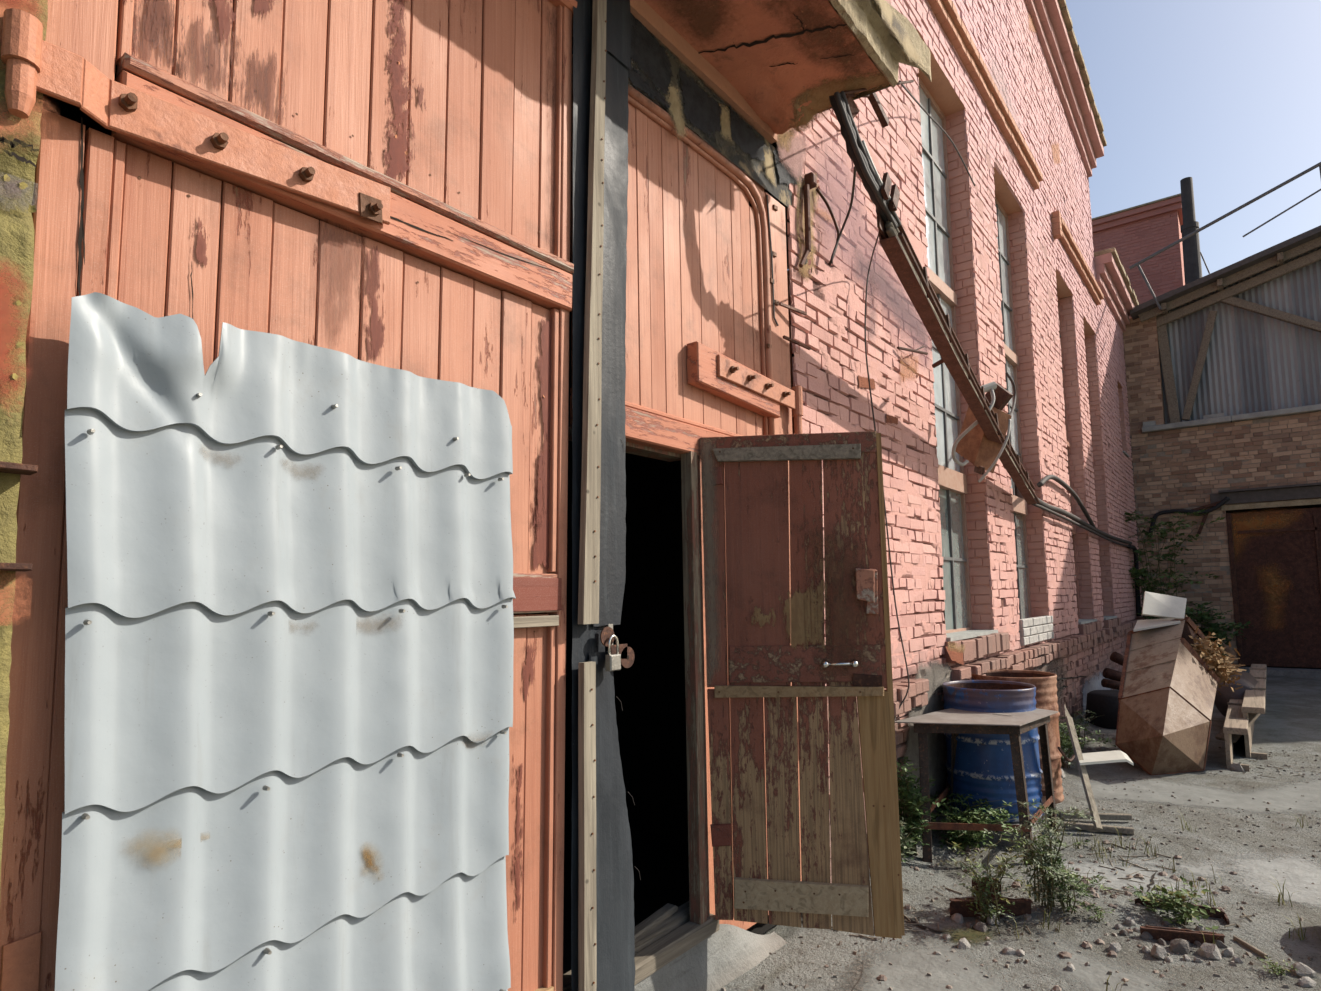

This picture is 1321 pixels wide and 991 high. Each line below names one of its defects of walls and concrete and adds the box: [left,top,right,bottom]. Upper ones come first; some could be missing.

peeling [132,0,287,126]
peeling [384,0,427,182]
crack [699,14,854,67]
peeling [362,245,385,361]
peeling [522,640,536,699]
peeling [751,580,829,650]
peeling [512,763,524,922]